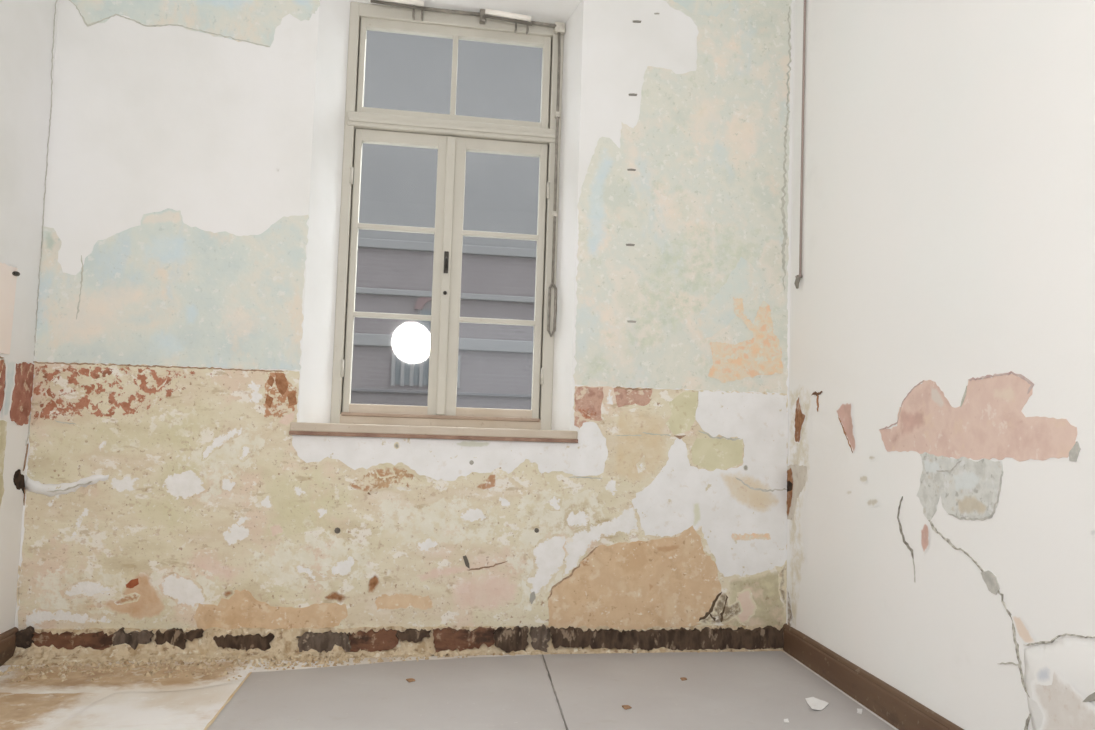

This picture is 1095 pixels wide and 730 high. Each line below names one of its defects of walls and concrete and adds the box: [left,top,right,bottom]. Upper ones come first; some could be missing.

peeling [0,0,807,631]
spalling [879,371,1081,521]
crack [897,496,1095,730]